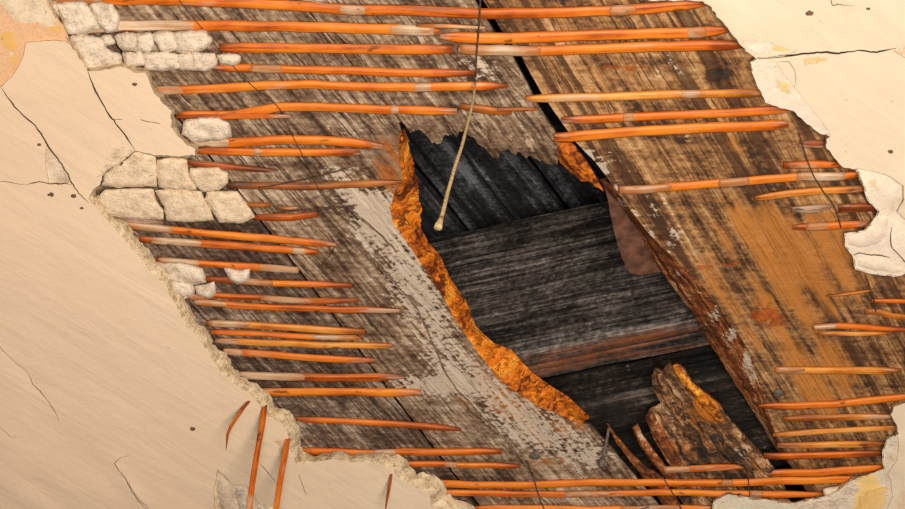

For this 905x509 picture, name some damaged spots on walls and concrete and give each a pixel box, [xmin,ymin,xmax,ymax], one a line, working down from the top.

spalling [0,0,69,86]
crack [0,89,88,202]
crack [87,70,135,182]
spalling [743,39,830,135]
crack [762,48,896,87]
spalling [844,168,905,277]
spalling [213,470,283,509]
spalling [712,435,899,509]